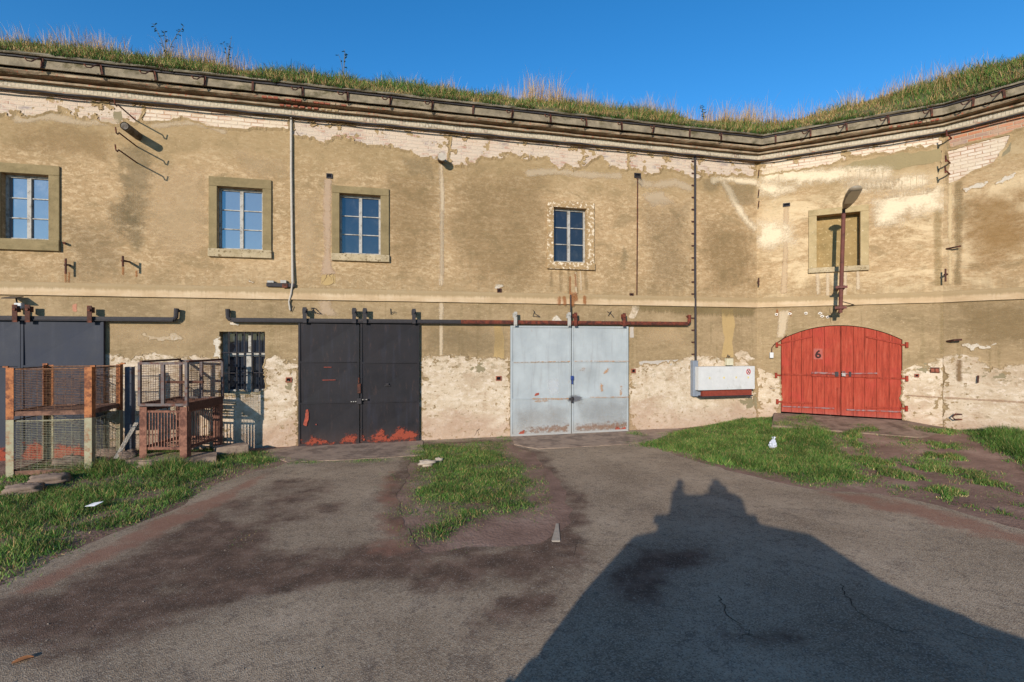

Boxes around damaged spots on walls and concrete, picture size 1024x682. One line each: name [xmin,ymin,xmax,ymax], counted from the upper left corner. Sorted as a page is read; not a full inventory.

flaking render [0,90,1024,193]
peeling [105,332,524,451]
corrosion [530,423,626,433]
peeling [615,350,783,430]
peeling [899,342,1024,431]